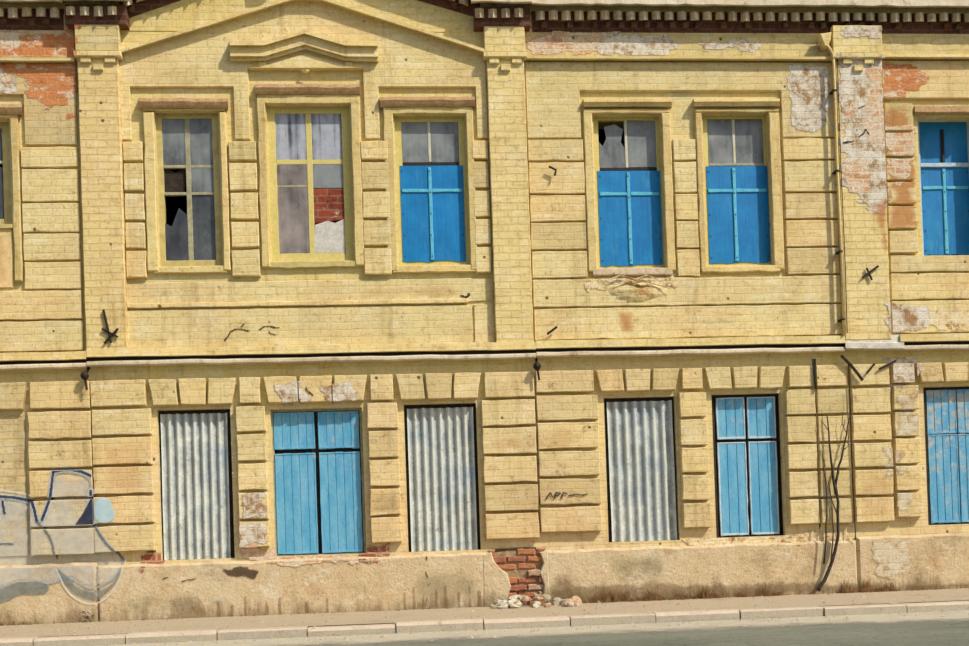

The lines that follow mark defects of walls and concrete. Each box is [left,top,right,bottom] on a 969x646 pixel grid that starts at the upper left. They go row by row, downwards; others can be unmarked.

spalling [0,24,81,119]
peeling [527,30,678,55]
peeling [841,25,882,39]
peeling [787,52,929,215]
flaking render [885,302,969,332]
flaking render [274,380,357,406]
flaking render [223,491,390,579]
spalling [483,547,550,607]